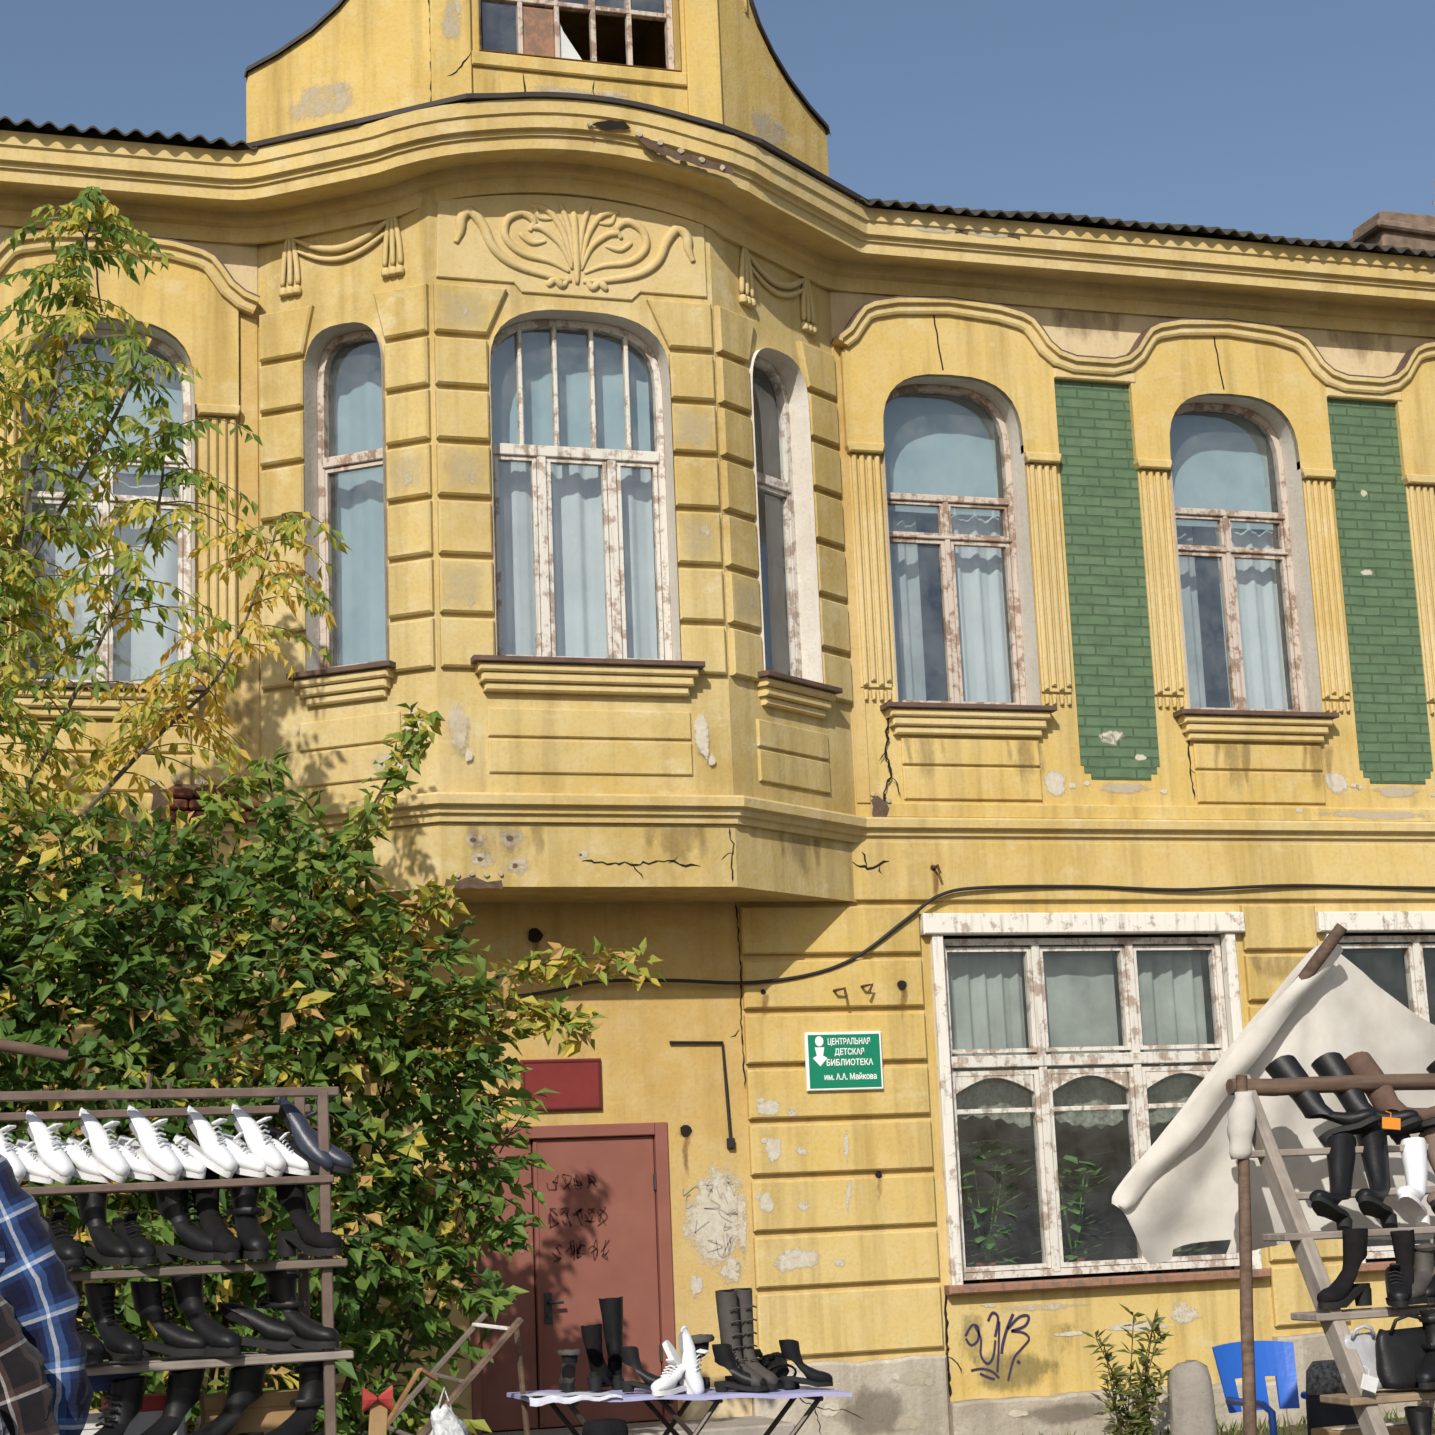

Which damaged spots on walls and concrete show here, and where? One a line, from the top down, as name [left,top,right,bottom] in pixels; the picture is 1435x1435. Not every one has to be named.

peeling [293,83,352,117]
spalling [635,130,734,175]
peeling [448,704,473,761]
peeling [694,714,716,765]
crack [879,718,901,801]
peeling [1044,770,1168,796]
spalling [445,831,529,889]
crack [853,852,889,874]
crack [583,827,746,1085]
peeling [757,1098,797,1116]
peeling [683,1166,774,1297]
peeling [774,1248,818,1273]